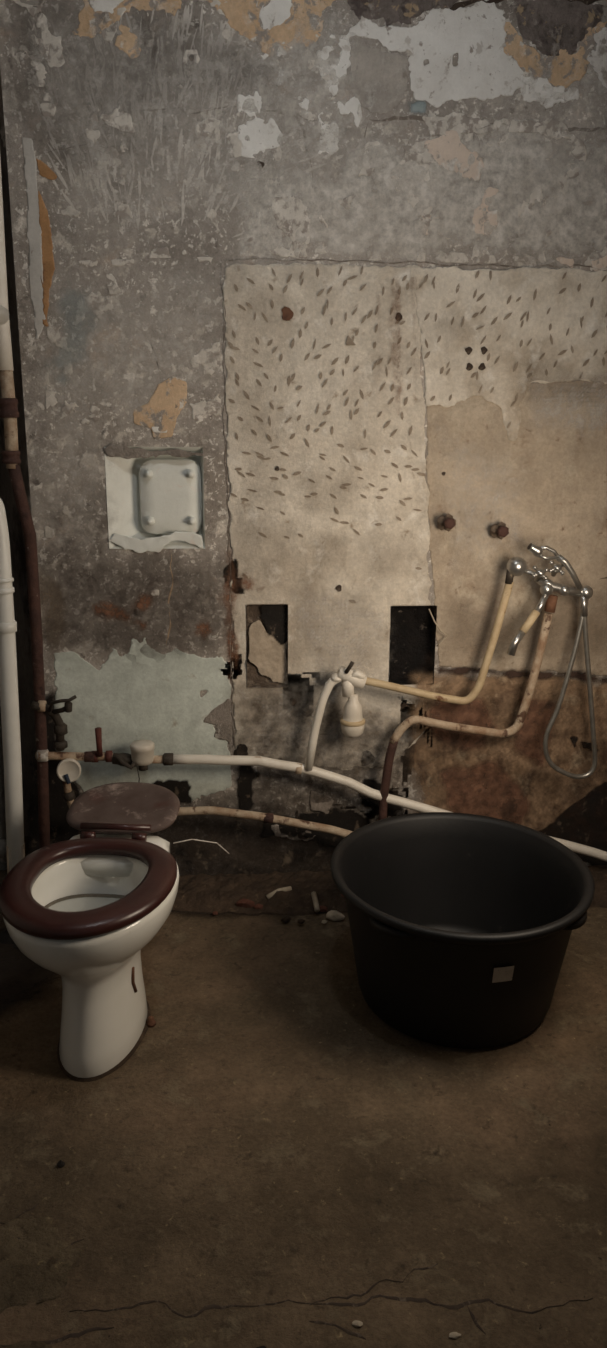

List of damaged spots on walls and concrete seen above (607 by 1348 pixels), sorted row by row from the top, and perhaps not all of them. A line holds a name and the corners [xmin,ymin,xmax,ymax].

peeling [36,0,184,70]
spalling [183,49,200,69]
crack [450,0,503,11]
crack [567,0,600,8]
peeling [207,0,607,235]
peeling [22,137,57,339]
peeling [133,376,187,439]
peeling [54,604,288,802]
crack [0,1263,593,1347]